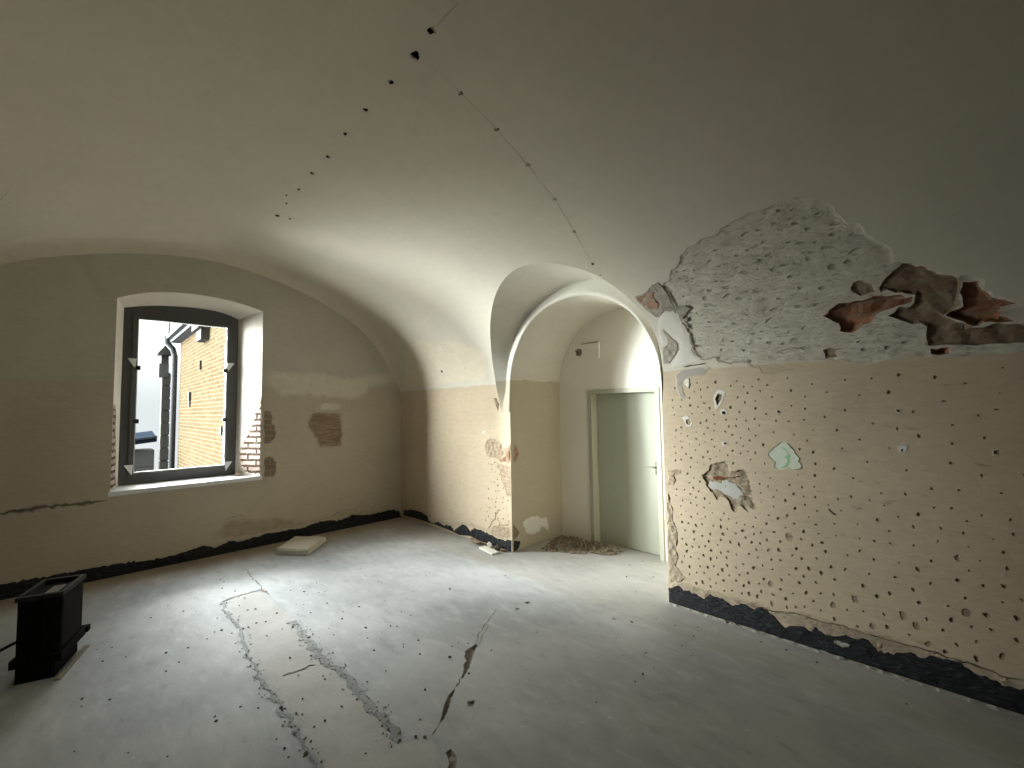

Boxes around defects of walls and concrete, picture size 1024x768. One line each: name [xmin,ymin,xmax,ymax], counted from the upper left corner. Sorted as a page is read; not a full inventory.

crack [429,65,591,261]
peeling [634,197,1024,365]
flaking render [238,392,277,479]
flaking render [306,411,344,449]
crack [0,499,107,516]
spalling [205,437,519,542]
spalling [666,377,1024,690]